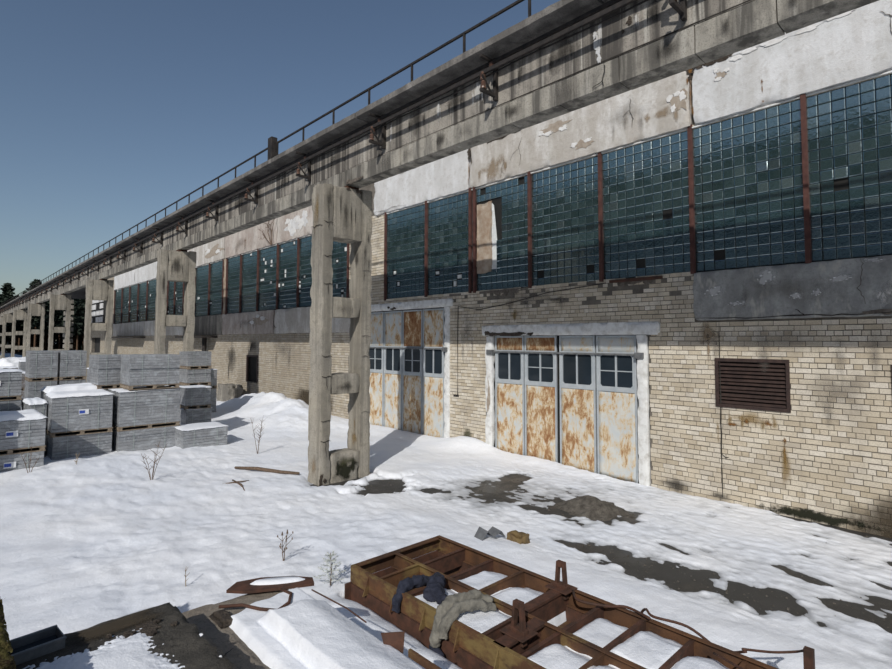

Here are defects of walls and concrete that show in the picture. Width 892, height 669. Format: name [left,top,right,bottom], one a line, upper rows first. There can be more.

spalling [593,32,602,63]
peeling [666,9,855,113]
crack [353,0,751,167]
peeling [538,119,573,137]
peeling [571,137,594,150]